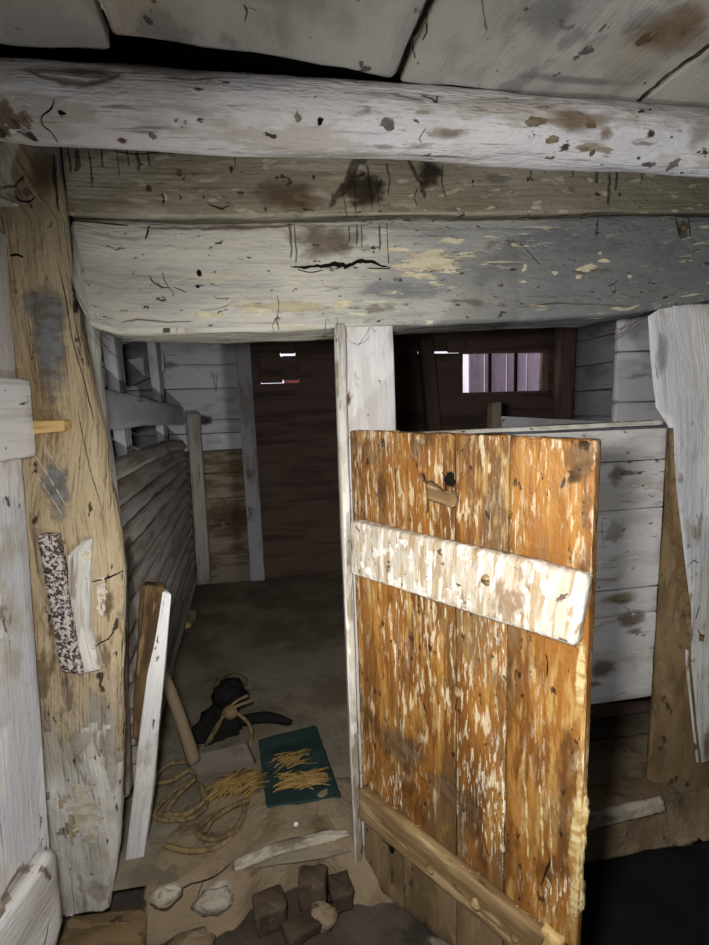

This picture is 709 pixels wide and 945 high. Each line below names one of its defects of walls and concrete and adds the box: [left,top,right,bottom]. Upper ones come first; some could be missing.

crack [291,222,391,273]
peeling [383,237,465,278]
peeling [569,440,592,482]
peeling [573,642,586,712]
peeling [568,772,589,917]